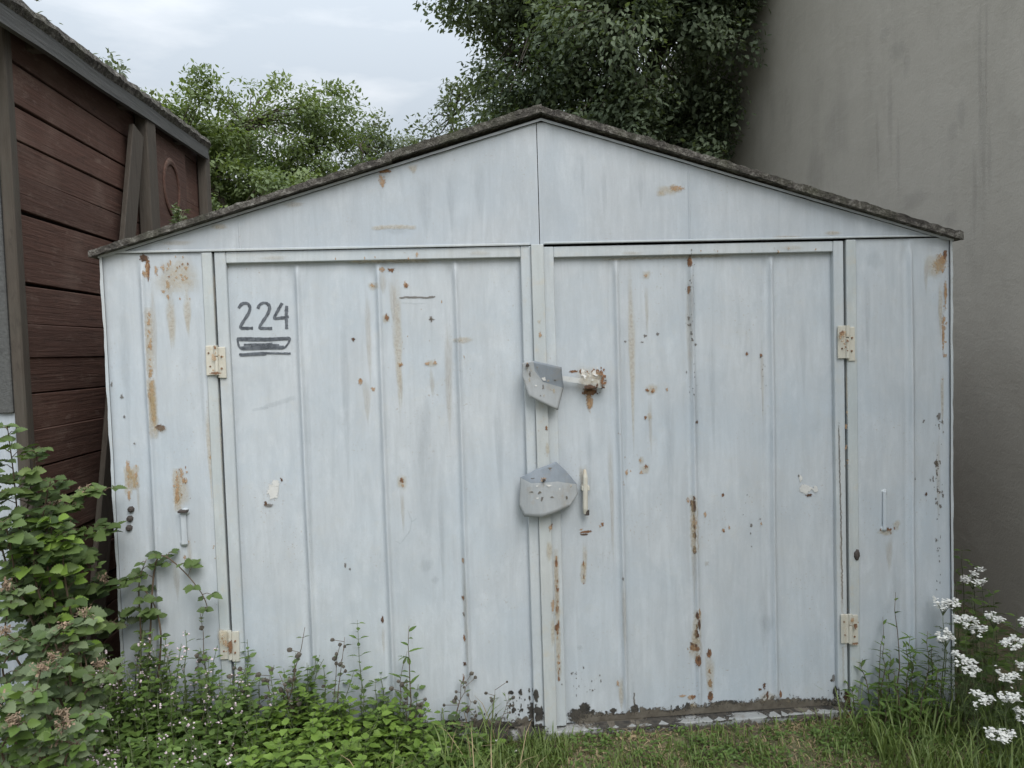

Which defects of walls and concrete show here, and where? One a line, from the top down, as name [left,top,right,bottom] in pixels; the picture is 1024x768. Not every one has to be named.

rust [139,248,190,300]
rust [932,250,947,357]
rust [147,313,156,423]
rust [571,366,606,409]
rust [126,461,138,500]
rust [173,466,191,504]
peeling [264,478,283,507]
rust [687,496,707,554]
rust [680,609,714,702]